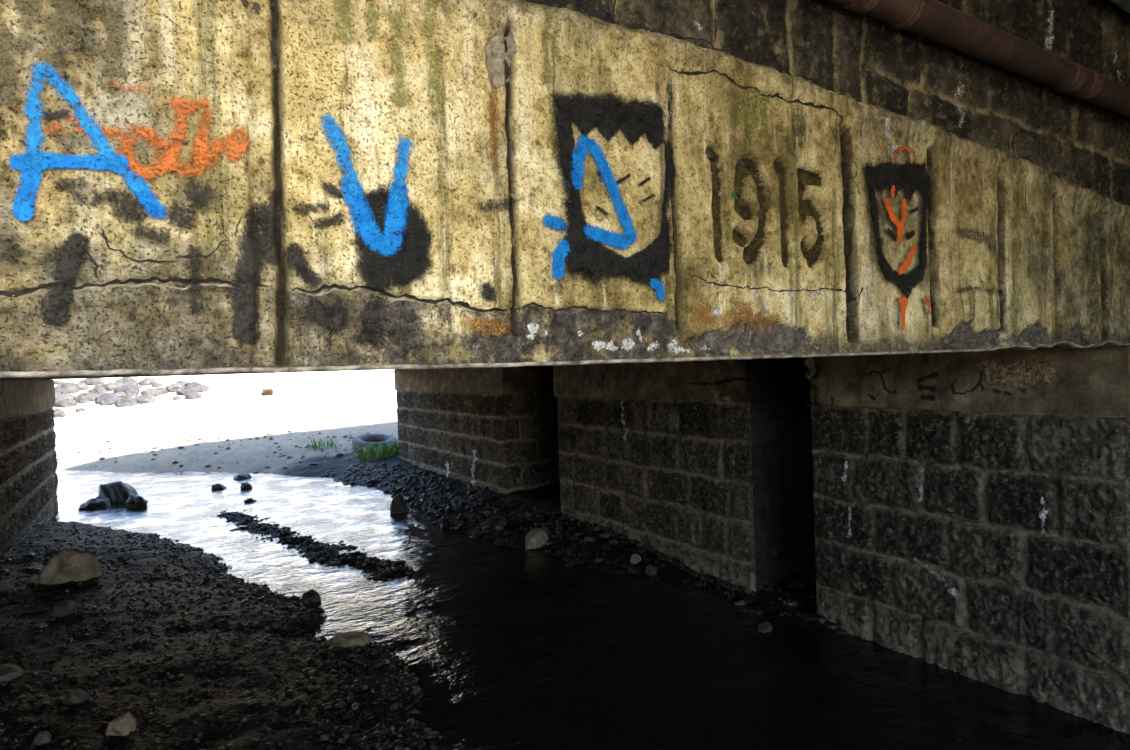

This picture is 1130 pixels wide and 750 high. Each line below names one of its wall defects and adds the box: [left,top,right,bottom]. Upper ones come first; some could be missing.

leakage [334,0,410,106]
leakage [421,0,444,113]
spalling [485,33,517,89]
crack [527,0,843,126]
crack [842,159,861,196]
crack [0,193,666,351]
corrosion [460,317,507,336]
leakage [526,322,548,340]
leakage [578,329,710,355]
corrosion [691,298,779,329]
leakage [1039,497,1048,534]